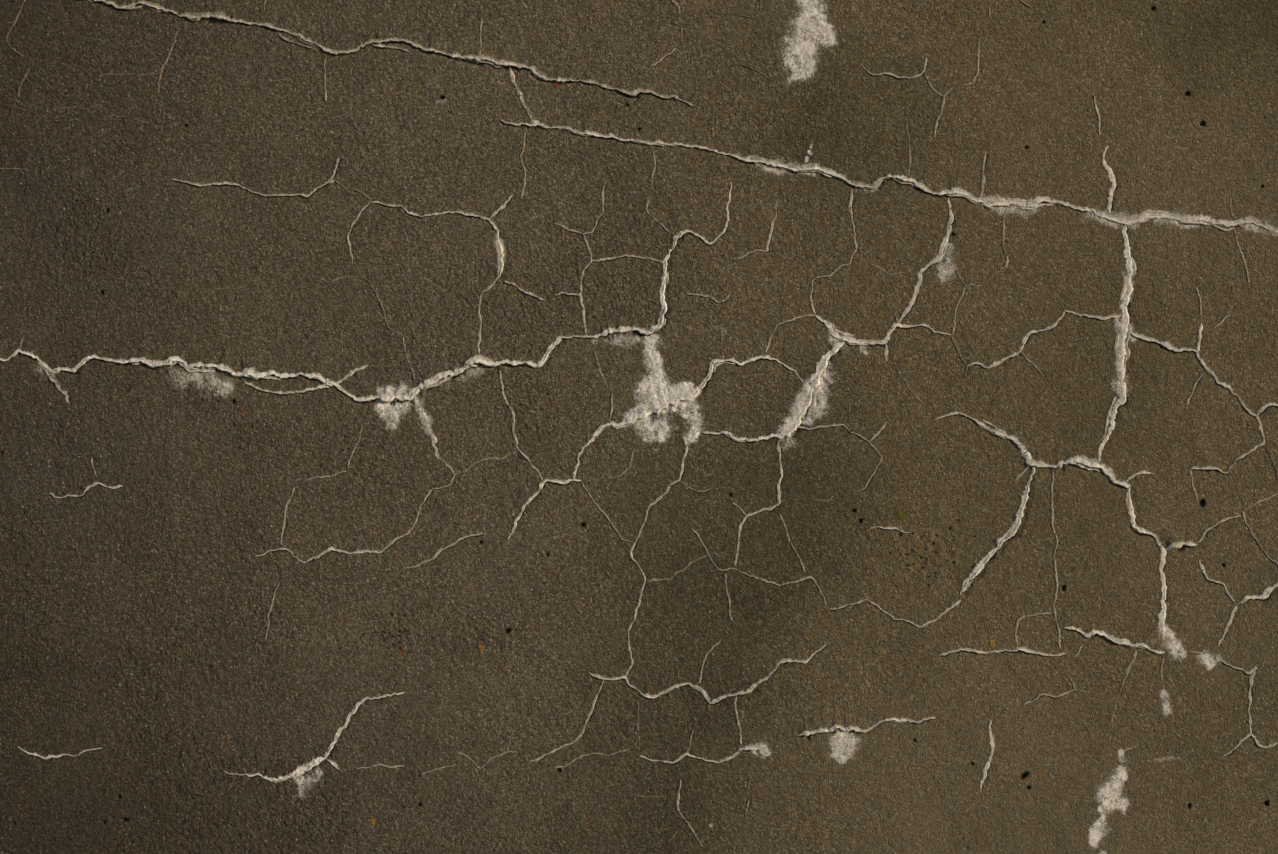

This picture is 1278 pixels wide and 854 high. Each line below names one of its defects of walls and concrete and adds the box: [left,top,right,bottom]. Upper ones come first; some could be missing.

crack [6,0,30,97]
crack [89,0,1278,658]
crack [0,158,827,765]
crack [224,692,406,783]
crack [422,726,518,774]
crack [555,749,628,768]
crack [636,780,703,846]
crack [798,716,936,738]
crack [965,721,995,813]
crack [1024,676,1085,705]
crack [1064,626,1164,724]
crack [1199,561,1278,757]